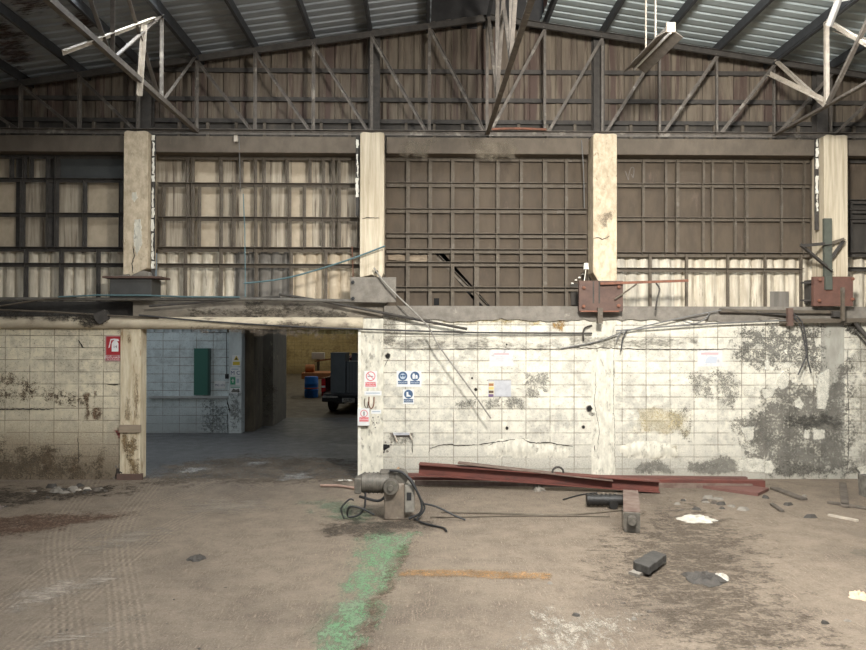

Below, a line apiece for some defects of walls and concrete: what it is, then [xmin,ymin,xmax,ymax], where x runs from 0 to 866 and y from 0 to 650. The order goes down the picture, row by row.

corrosion [58,13,94,28]
crack [385,337,726,454]
leakage [669,407,691,439]
leakage [688,323,865,479]